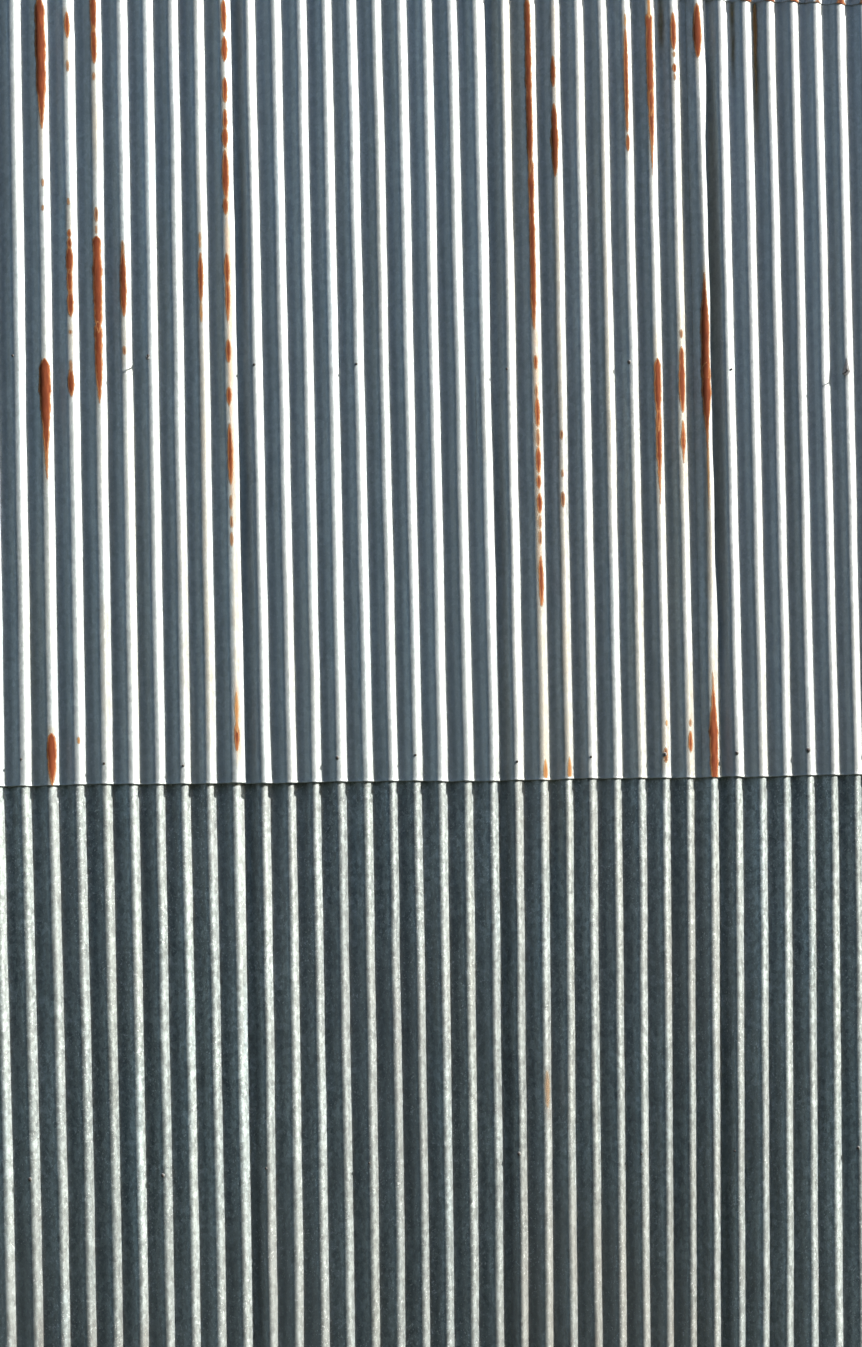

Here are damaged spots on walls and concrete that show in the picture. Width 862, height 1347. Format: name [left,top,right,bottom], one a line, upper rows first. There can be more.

rust [34,0,46,129]
rust [221,0,229,214]
rust [524,0,537,329]
rust [550,103,559,177]
rust [645,0,654,169]
rust [38,358,51,479]
rust [65,229,74,334]
rust [92,207,103,403]
rust [119,240,127,316]
rust [534,355,544,606]
rust [654,358,662,504]
rust [678,273,712,496]